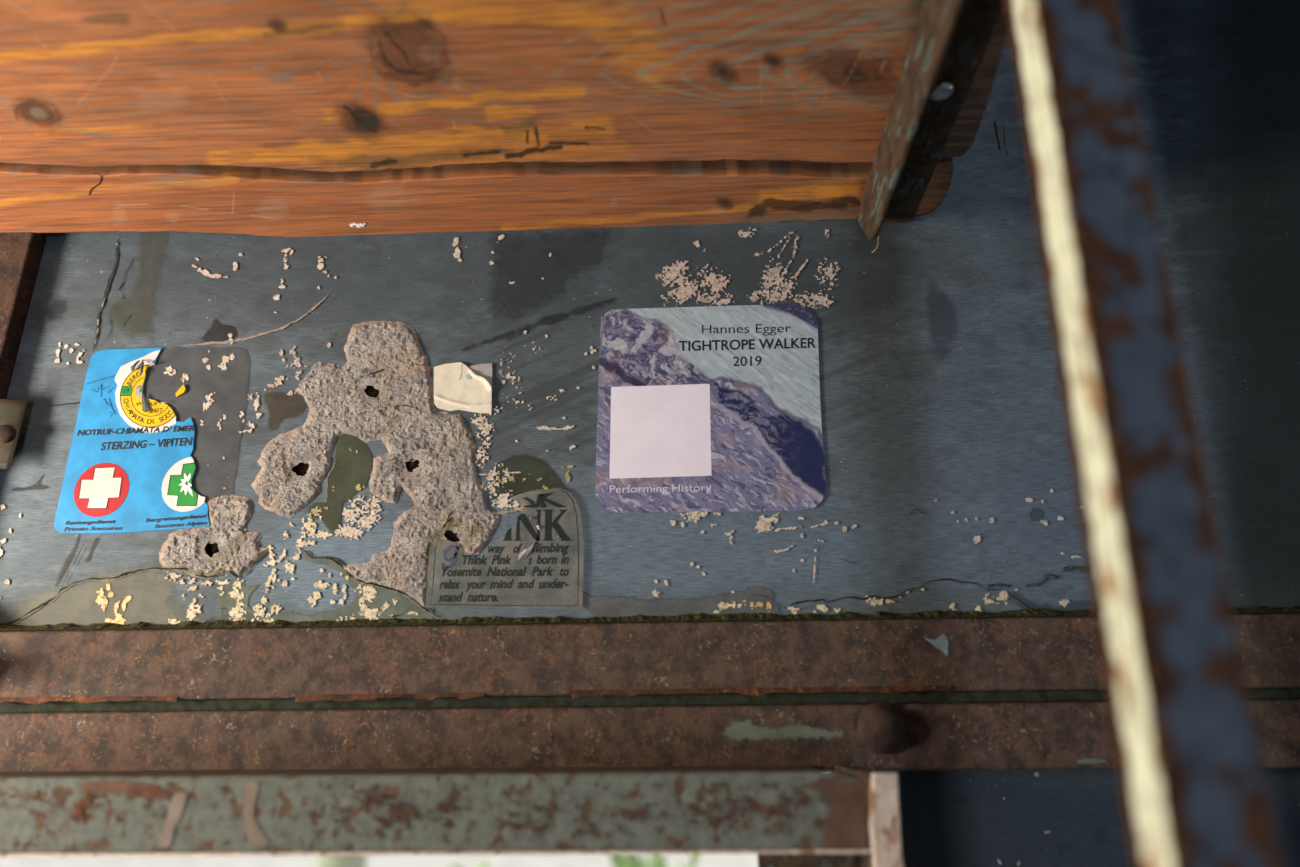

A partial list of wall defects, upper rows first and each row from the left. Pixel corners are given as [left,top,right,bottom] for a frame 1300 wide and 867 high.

peeling [452,237,462,262]
peeling [655,231,841,309]
peeling [537,417,574,431]
spalling [159,321,548,624]
peeling [951,511,994,547]
peeling [865,588,924,607]
peeling [975,589,1018,611]
rust [0,781,186,848]
rust [243,782,268,845]
rust [330,783,479,839]
rust [495,773,870,857]